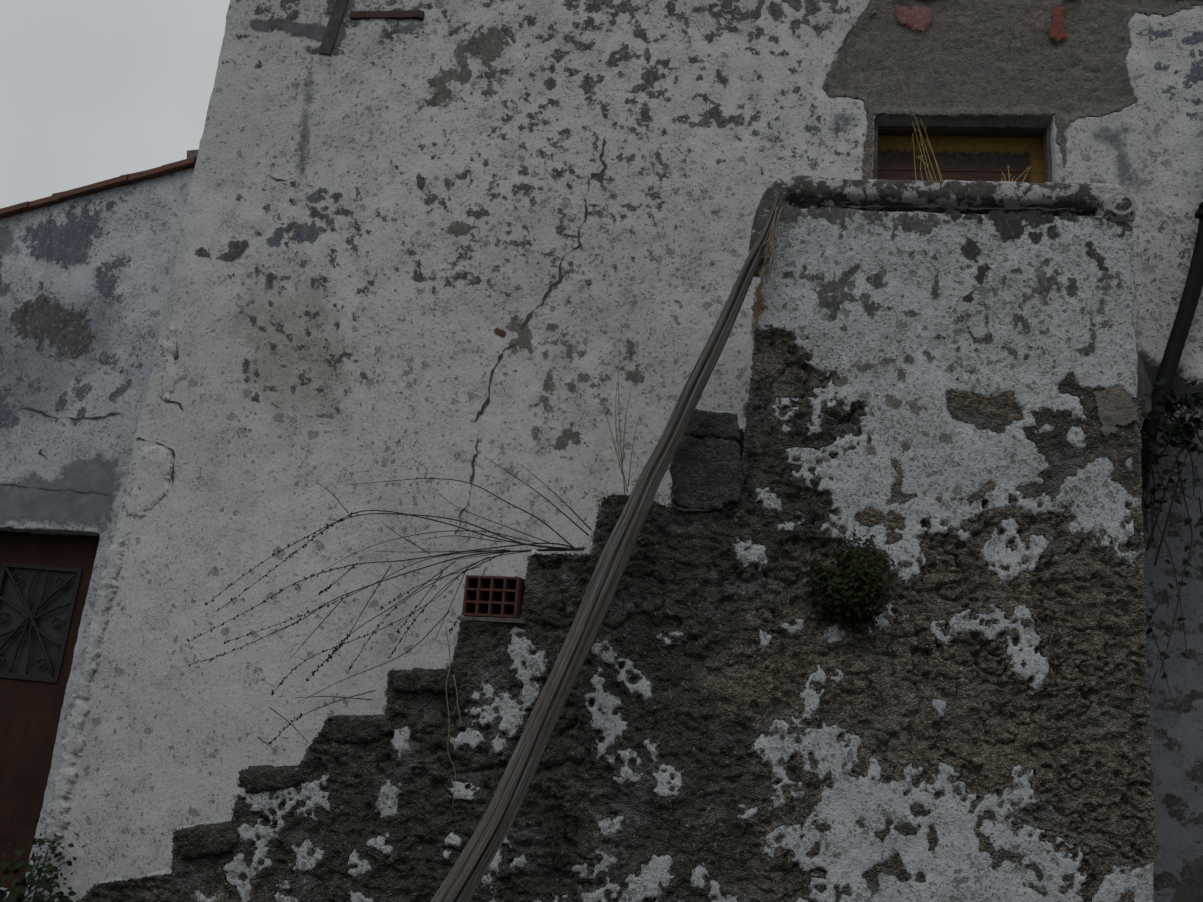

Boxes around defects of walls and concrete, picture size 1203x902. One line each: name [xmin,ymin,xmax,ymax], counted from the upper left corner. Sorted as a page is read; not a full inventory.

crack [0,483,110,495]
crack [20,407,175,486]
peeling [236,0,335,36]
peeling [195,168,405,427]
spalling [77,489,630,902]
crack [454,137,607,534]
spalling [343,0,1203,311]
spalling [469,199,1203,902]